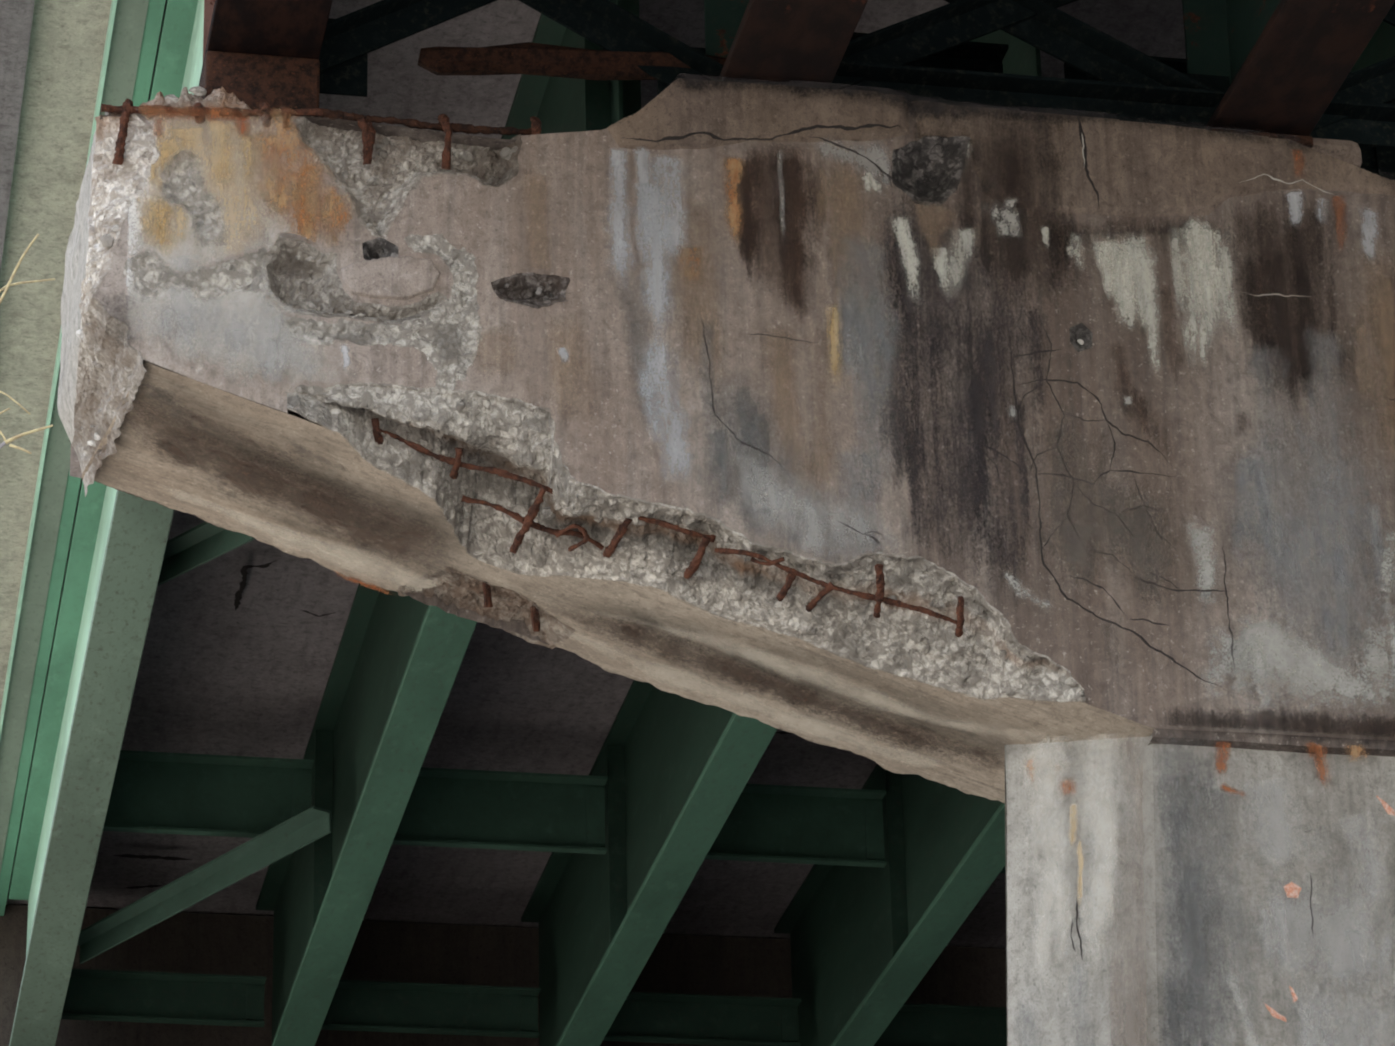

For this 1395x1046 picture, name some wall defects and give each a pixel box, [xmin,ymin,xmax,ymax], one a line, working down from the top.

rust [139,106,252,185]
crack [623,124,914,195]
efflorescence [605,148,686,321]
damp [1166,191,1335,405]
damp [1362,210,1377,258]
spalling [72,86,1086,703]
efflorescence [640,341,689,473]
damp [748,122,1159,607]
crack [955,304,1235,693]
rust [1215,742,1244,795]
damp [1169,712,1395,737]
rust [1307,742,1328,784]